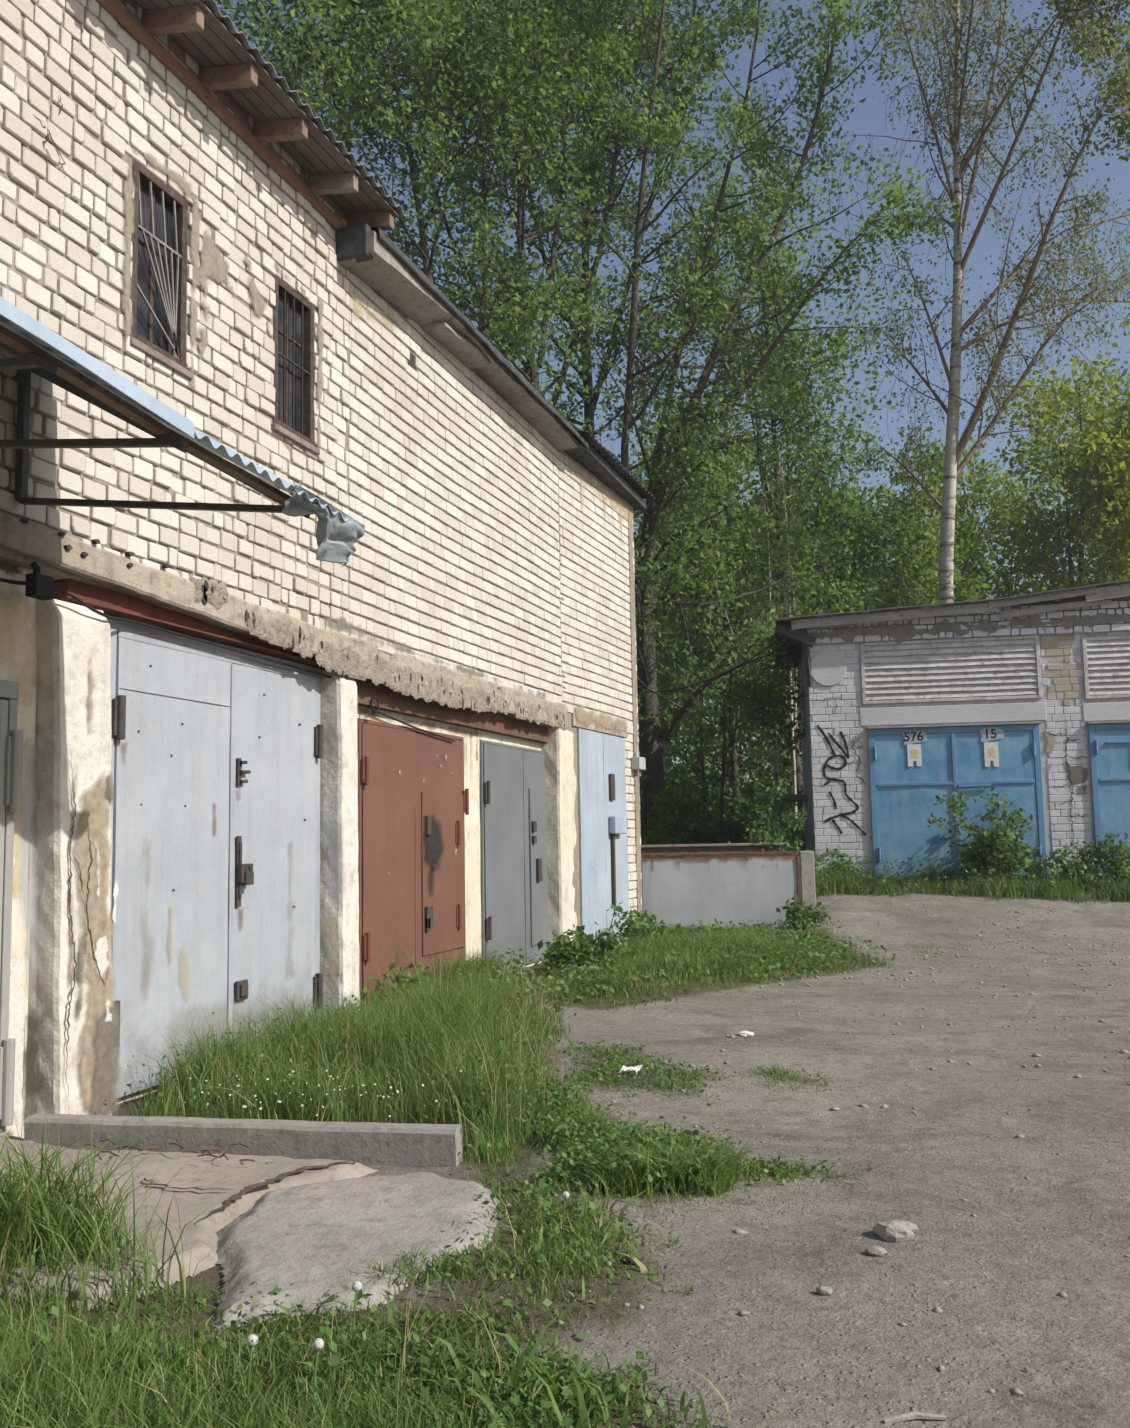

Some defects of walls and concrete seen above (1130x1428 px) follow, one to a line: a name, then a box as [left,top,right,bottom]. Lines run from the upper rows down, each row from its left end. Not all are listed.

spalling [58,532,100,557]
spalling [191,577,568,728]
peeling [1044,731,1088,795]
crack [1049,713,1089,852]
crack [128,1157,370,1222]